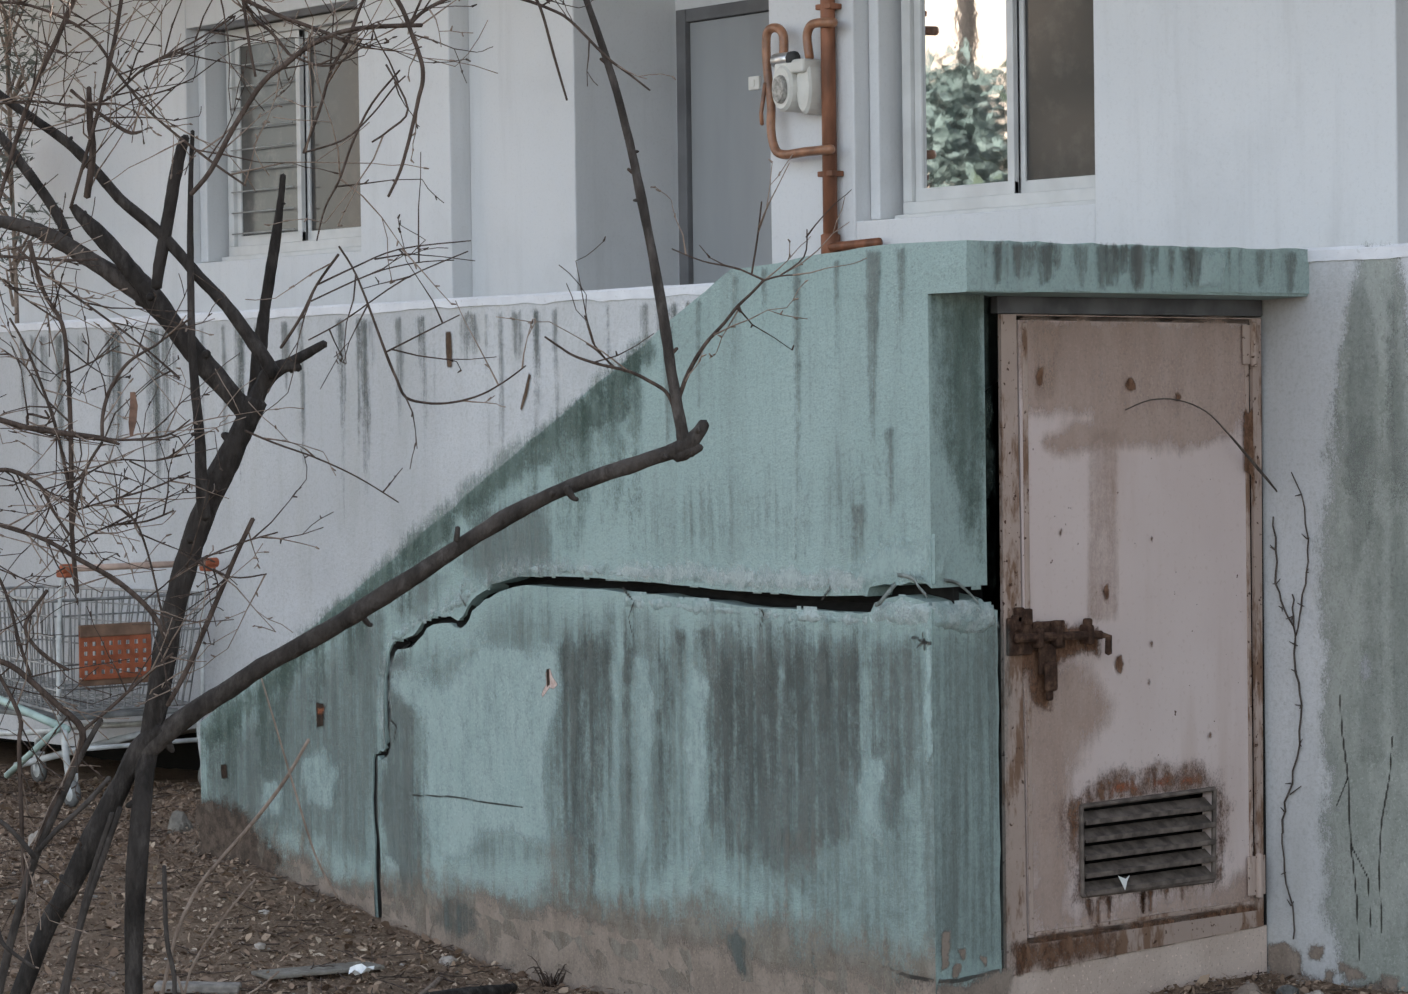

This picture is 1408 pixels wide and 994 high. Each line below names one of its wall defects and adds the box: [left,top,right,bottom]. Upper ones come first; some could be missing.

leakage [282,324,304,416]
leakage [304,337,655,633]
leakage [867,253,880,343]
leakage [1080,246,1153,288]
leakage [202,644,323,761]
leakage [382,659,420,897]
leakage [549,635,635,897]
crack [374,558,959,918]
leakage [676,630,857,860]
corrosion [1011,624,1257,975]
leakage [1318,246,1408,993]
leakage [728,932,746,975]